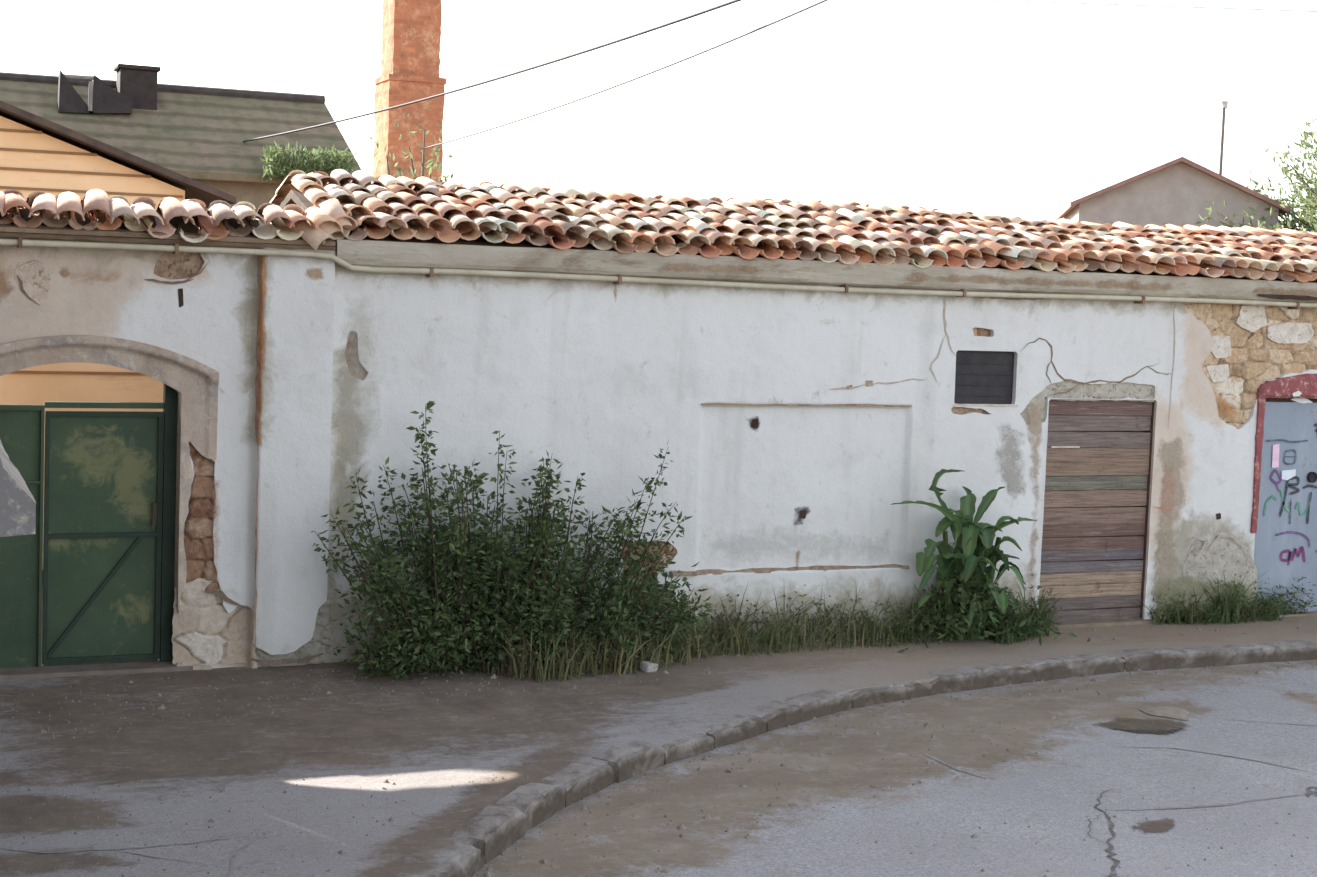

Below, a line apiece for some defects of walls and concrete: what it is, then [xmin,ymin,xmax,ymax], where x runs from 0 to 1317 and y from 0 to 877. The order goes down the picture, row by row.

spalling [153,251,204,280]
spalling [345,331,367,380]
crack [830,296,956,390]
spalling [951,403,988,414]
spalling [973,327,991,337]
crack [979,294,1043,302]
water stain [997,405,1042,493]
spalling [1020,381,1155,425]
crack [1022,309,1175,428]
spalling [1182,288,1317,429]
spalling [171,442,333,668]
water stain [1155,439,1184,600]